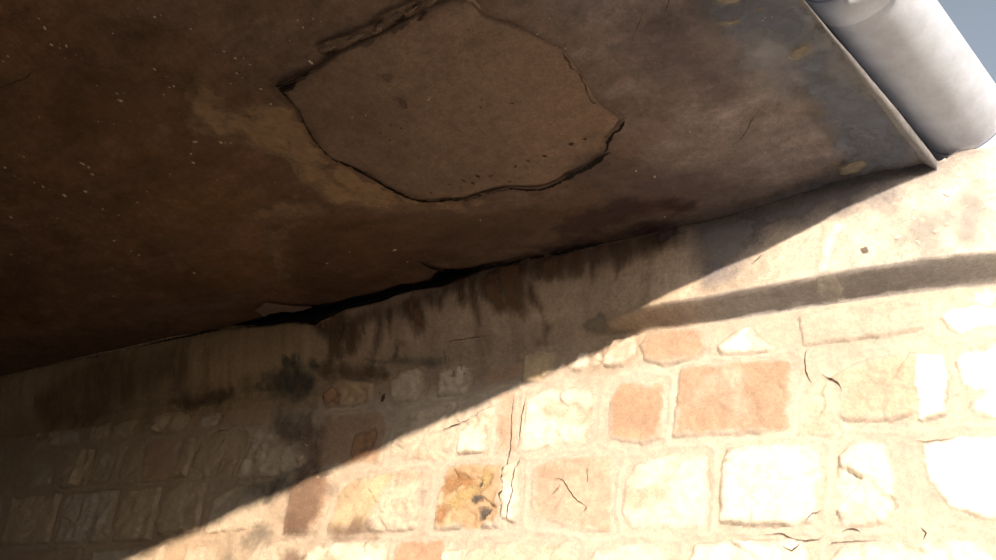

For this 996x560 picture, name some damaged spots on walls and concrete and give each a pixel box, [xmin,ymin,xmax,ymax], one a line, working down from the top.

peeling [255,302,312,317]
damp [273,228,676,393]
damp [697,160,942,280]
crack [804,349,841,387]
damp [817,225,842,295]
crack [441,395,527,527]